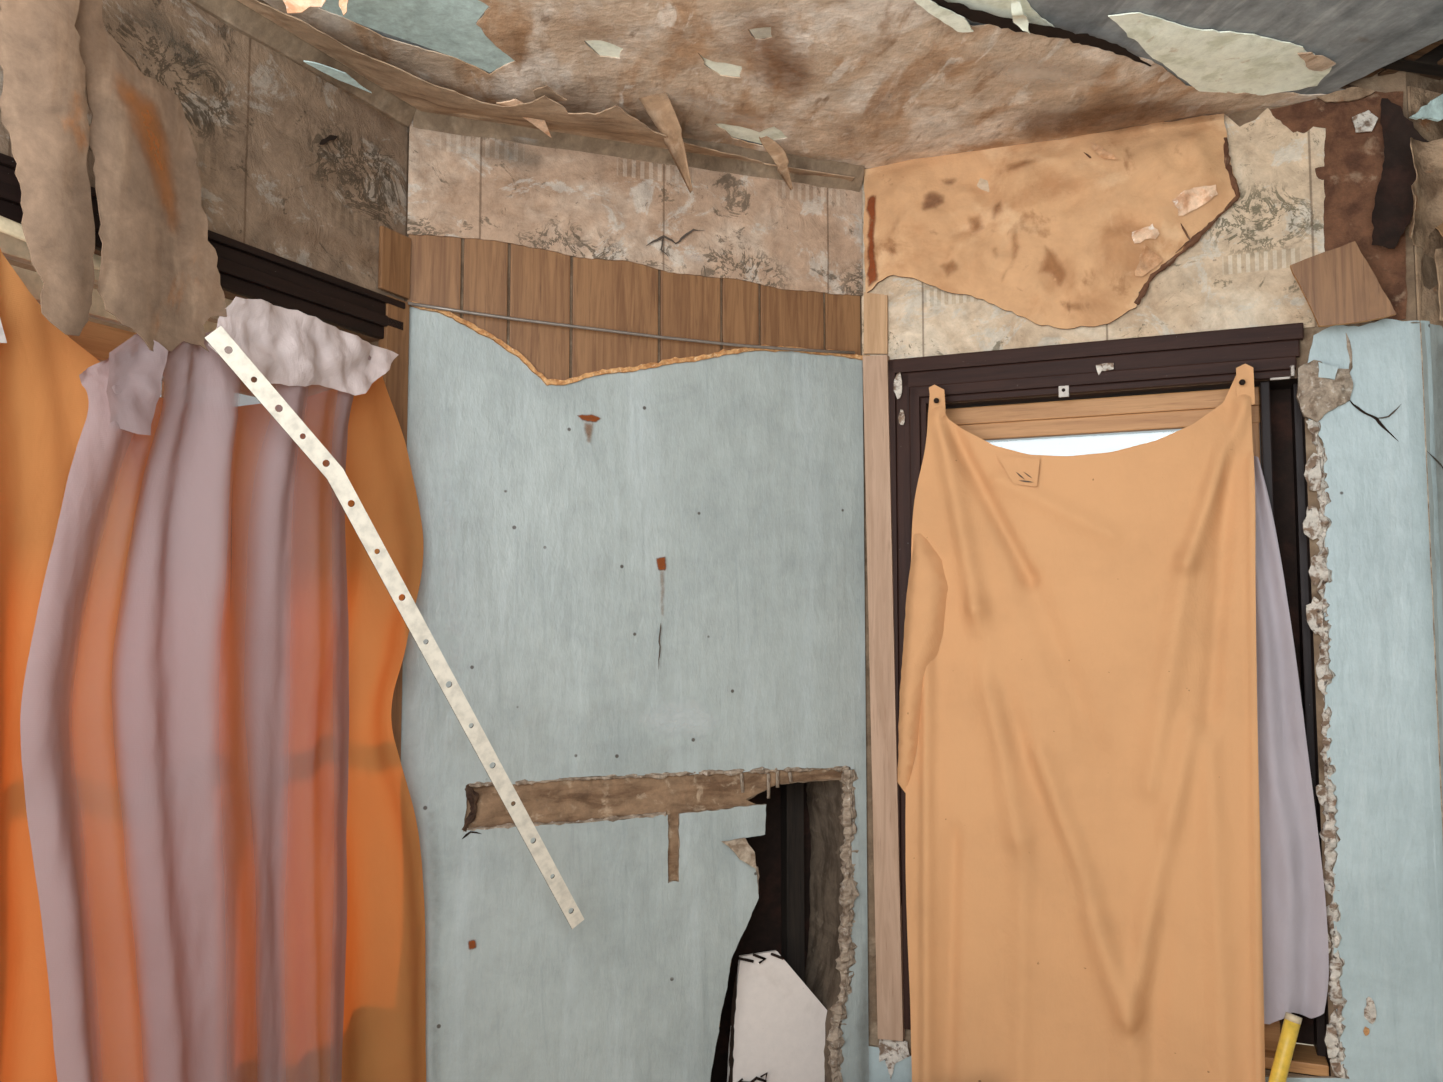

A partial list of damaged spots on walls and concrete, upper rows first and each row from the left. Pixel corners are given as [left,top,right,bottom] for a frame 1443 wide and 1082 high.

peeling [320,0,514,72]
peeling [586,40,623,58]
peeling [701,56,742,77]
peeling [914,0,1054,34]
peeling [1108,12,1378,133]
peeling [716,123,786,144]
corrosion [578,415,600,436]
crack [1346,334,1443,468]
corrosion [657,557,666,570]
spalling [1303,420,1350,1079]
spalling [710,782,811,1082]
spalling [826,769,859,1082]